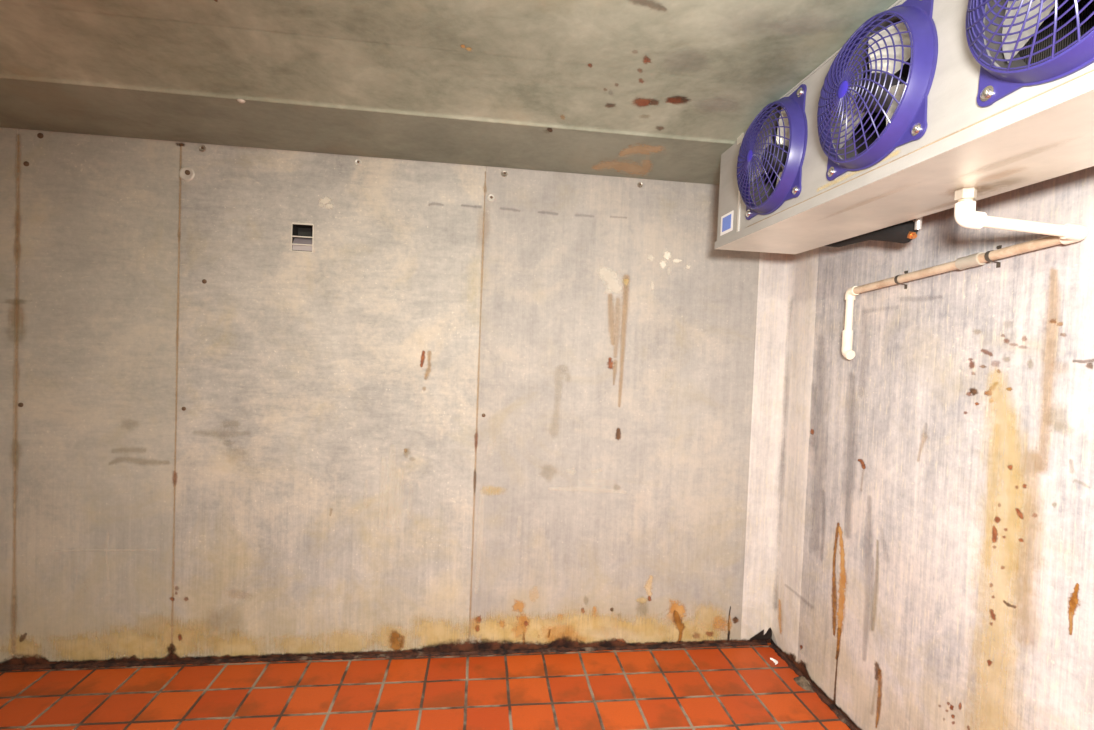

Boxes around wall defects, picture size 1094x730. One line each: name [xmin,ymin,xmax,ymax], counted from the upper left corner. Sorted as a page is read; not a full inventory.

rust [634,96,689,106]
rust [964,370,1012,414]
rust [0,208,862,730]
rust [1068,583,1079,635]
water stain [8,637,38,657]
water stain [53,624,197,661]
water stain [214,632,258,656]
water stain [284,634,366,654]
water stain [379,609,727,649]